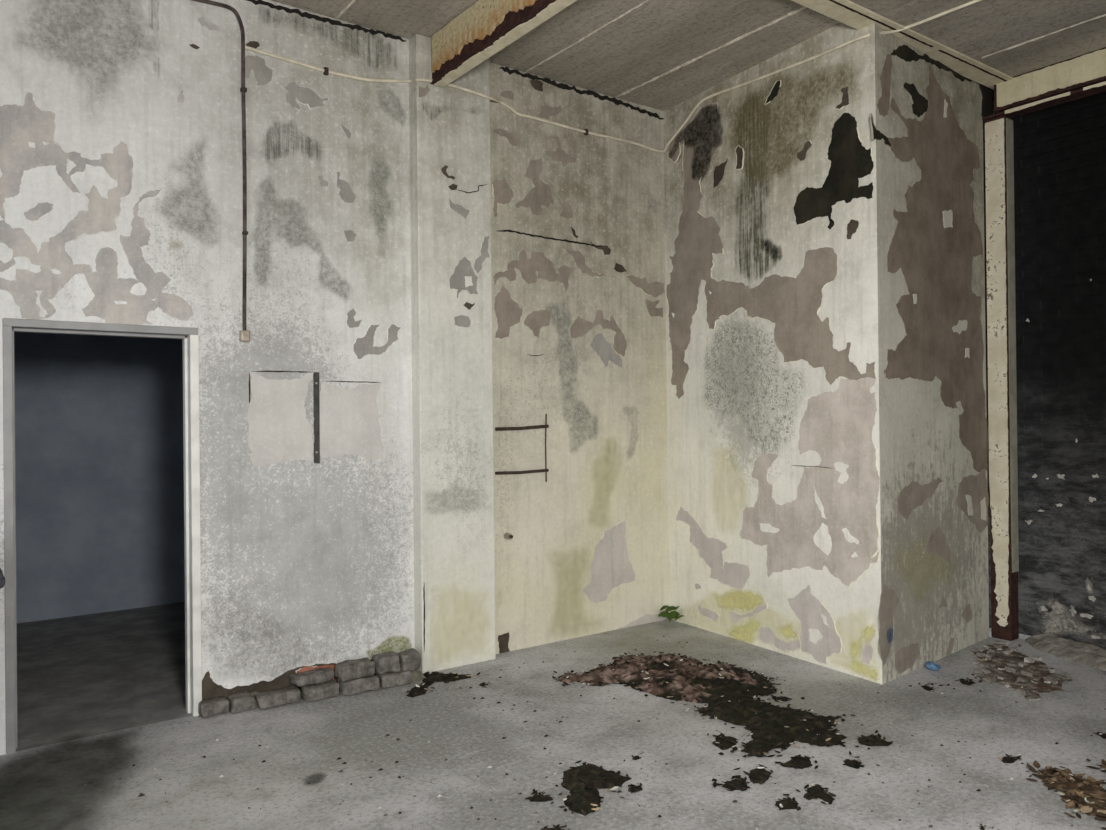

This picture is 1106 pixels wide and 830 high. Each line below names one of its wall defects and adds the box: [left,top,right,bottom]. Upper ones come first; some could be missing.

damp [38,0,140,78]
peeling [0,92,193,325]
damp [670,70,851,278]
peeling [449,235,490,328]
peeling [347,308,401,359]
peeling [492,45,1106,629]
damp [705,328,801,449]
flaking render [498,632,510,653]
peeling [759,585,843,664]
peeling [861,583,920,674]